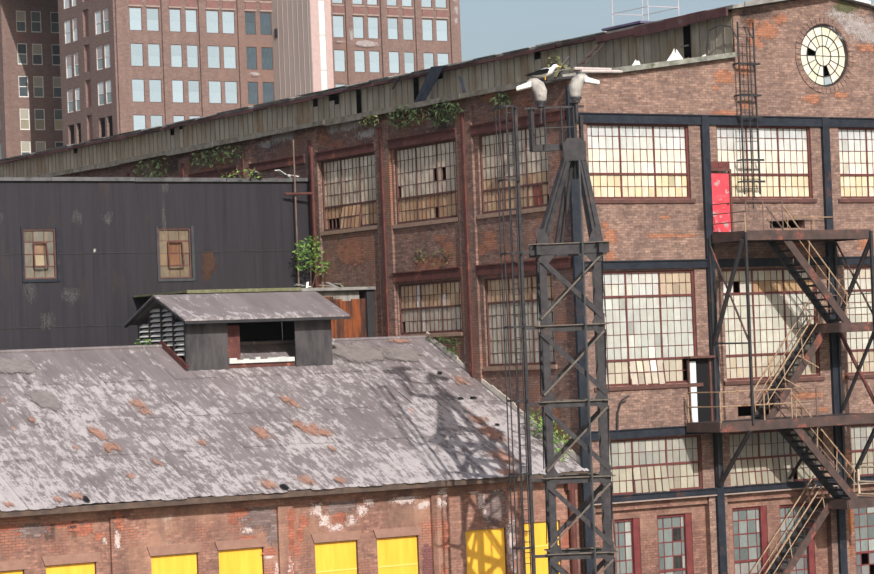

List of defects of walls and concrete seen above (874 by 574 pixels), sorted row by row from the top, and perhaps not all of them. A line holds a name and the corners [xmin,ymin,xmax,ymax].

rust [325,296,367,338]